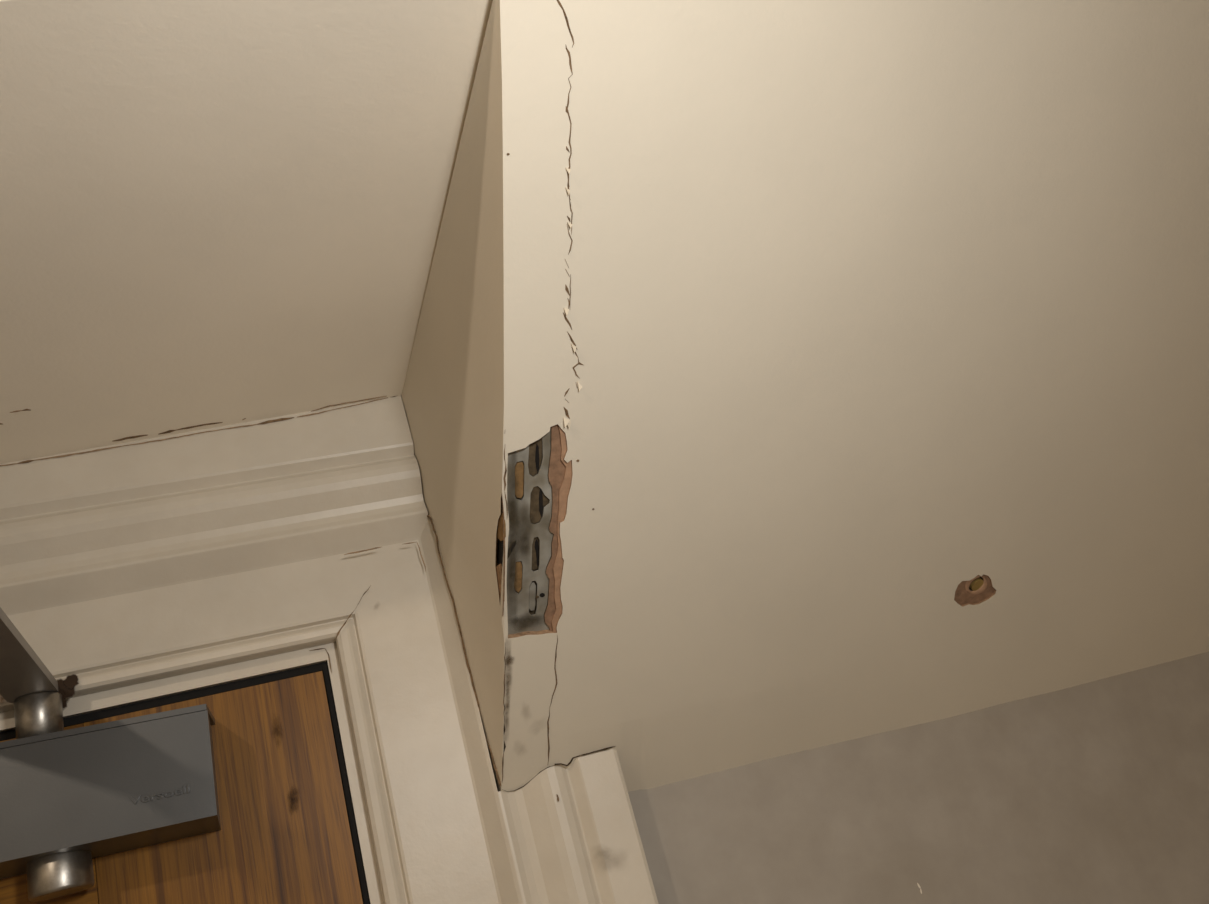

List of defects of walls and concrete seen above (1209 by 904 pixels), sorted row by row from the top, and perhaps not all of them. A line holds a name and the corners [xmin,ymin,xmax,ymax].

crack [557,0,583,429]
crack [0,396,395,466]
crack [310,587,370,672]
crack [344,514,615,792]
flaking render [495,424,573,638]
spalling [954,574,996,607]